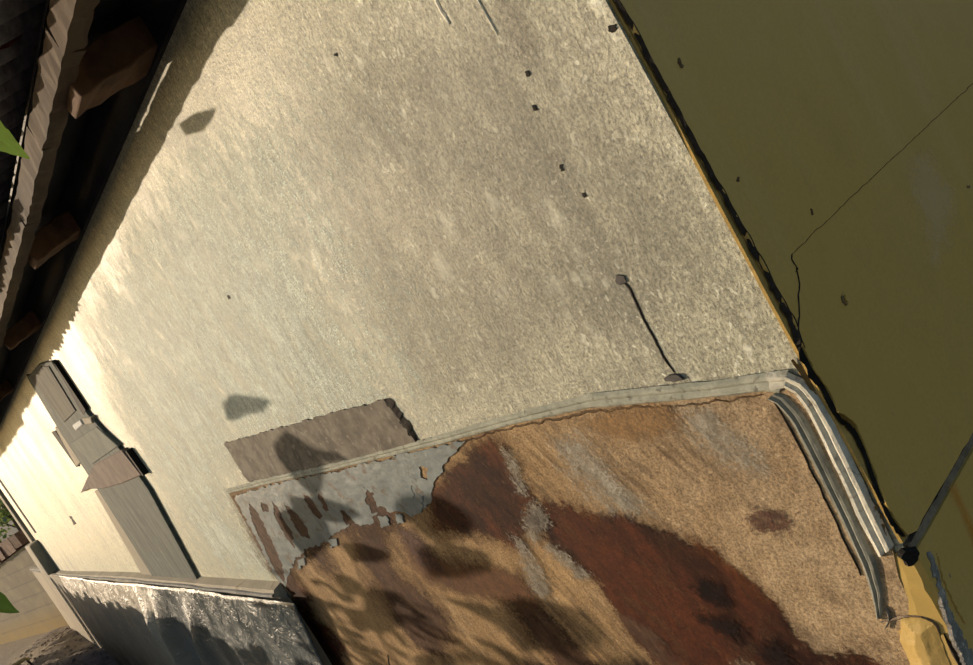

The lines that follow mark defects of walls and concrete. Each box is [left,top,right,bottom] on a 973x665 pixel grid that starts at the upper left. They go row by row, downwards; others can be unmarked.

crack [614,0,973,349]
peeling [229,440,466,598]
water stain [554,439,642,513]
water stain [286,573,349,665]
water stain [349,522,456,658]
water stain [501,594,597,665]
spalling [926,551,973,665]